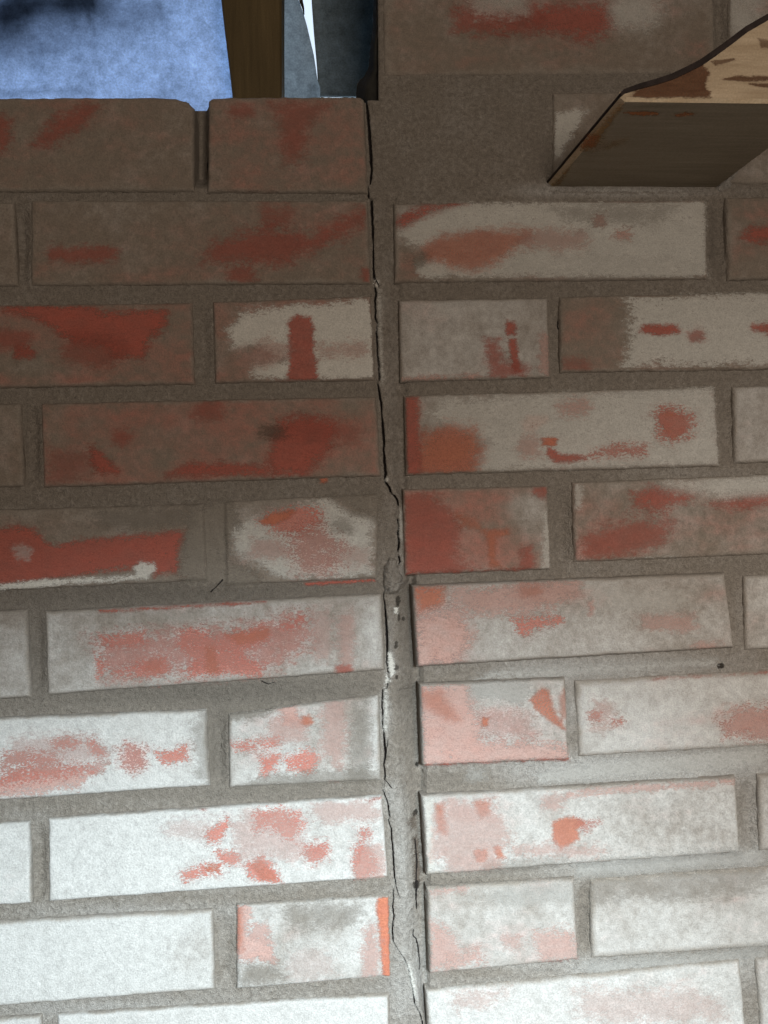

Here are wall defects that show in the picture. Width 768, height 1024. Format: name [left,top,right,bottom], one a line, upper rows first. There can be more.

crack [366,103,401,564]
crack [381,593,423,1024]